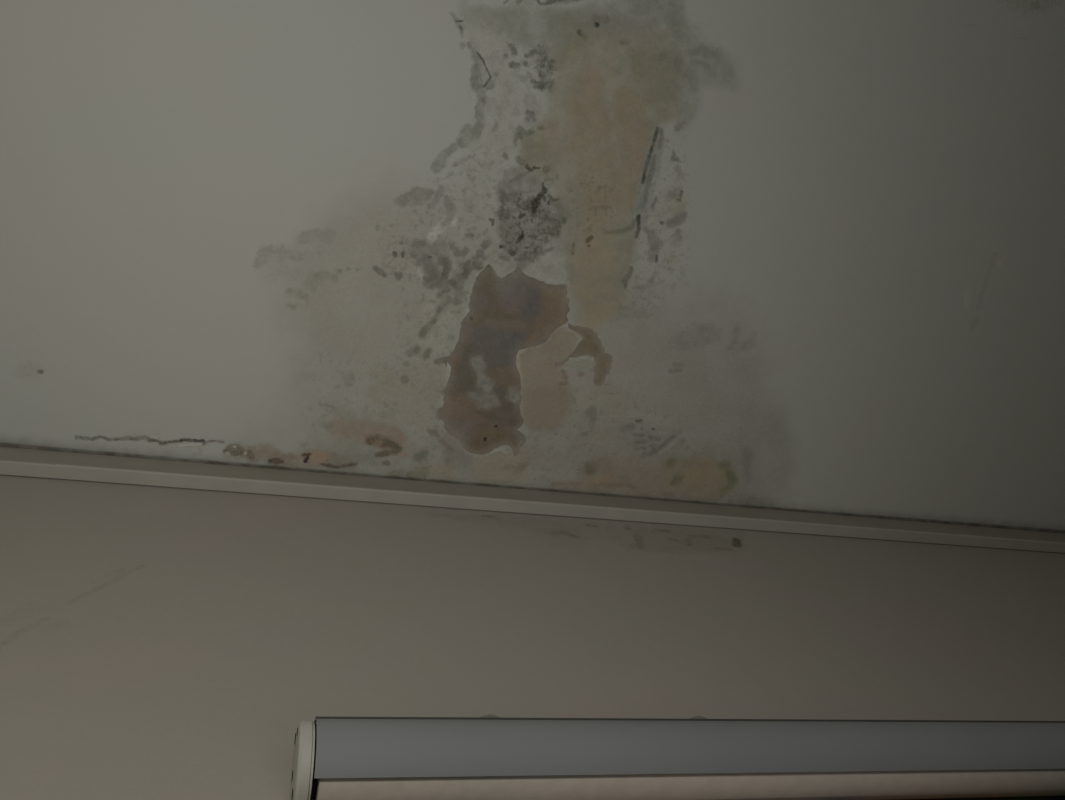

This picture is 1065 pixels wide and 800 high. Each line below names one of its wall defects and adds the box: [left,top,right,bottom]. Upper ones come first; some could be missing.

leakage [492,0,684,326]
crack [81,436,216,444]
leakage [398,187,484,363]
flaking render [437,264,613,457]